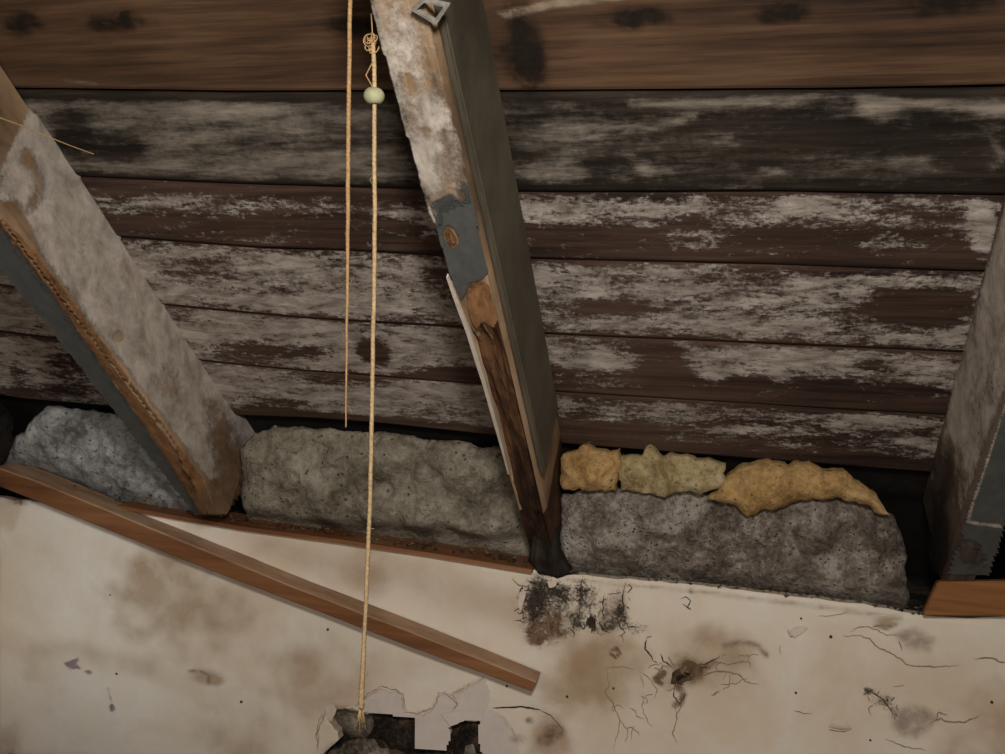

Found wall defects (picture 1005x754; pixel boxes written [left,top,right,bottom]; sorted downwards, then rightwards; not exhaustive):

peeling [316,676,520,754]
damp [514,575,635,701]
crack [605,636,781,746]